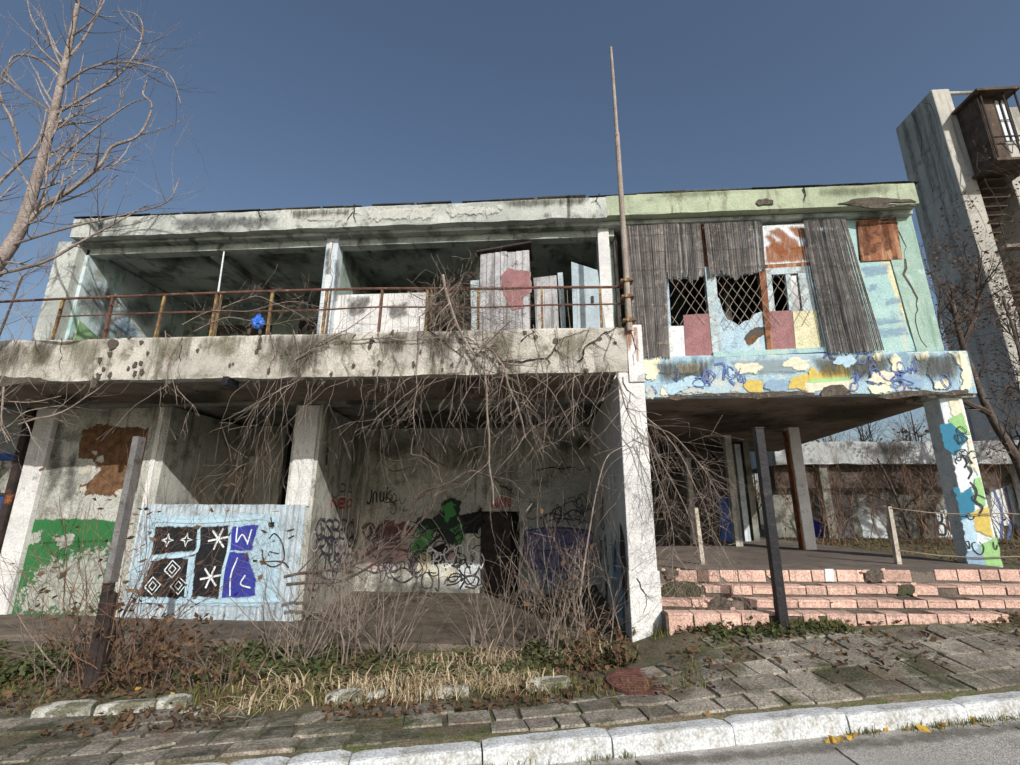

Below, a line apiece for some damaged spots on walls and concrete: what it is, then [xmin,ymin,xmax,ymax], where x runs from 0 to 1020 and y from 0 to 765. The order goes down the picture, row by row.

damp [179,217,274,229]
crack [895,217,927,347]
spalling [90,301,150,388]
flaking render [78,424,149,498]